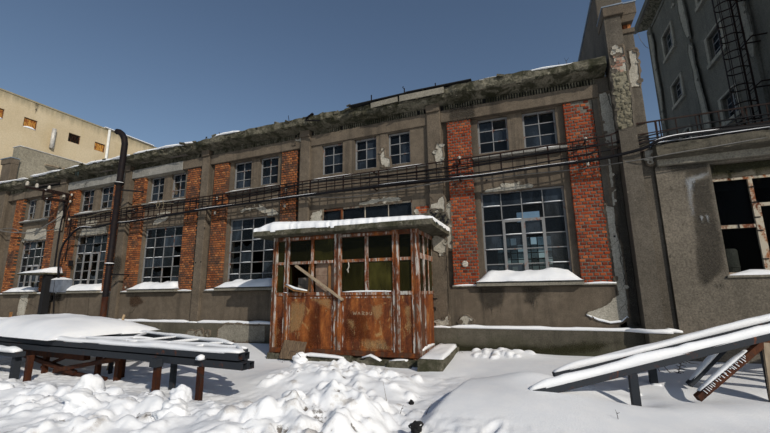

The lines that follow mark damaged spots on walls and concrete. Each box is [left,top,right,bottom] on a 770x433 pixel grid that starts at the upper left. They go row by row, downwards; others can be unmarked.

spalling [597,43,643,148]
peeling [379,147,392,169]
peeling [432,141,445,165]
peeling [482,180,534,194]
peeling [238,202,280,218]
peeling [358,195,402,207]
damp [671,160,770,282]
peeling [585,158,631,325]